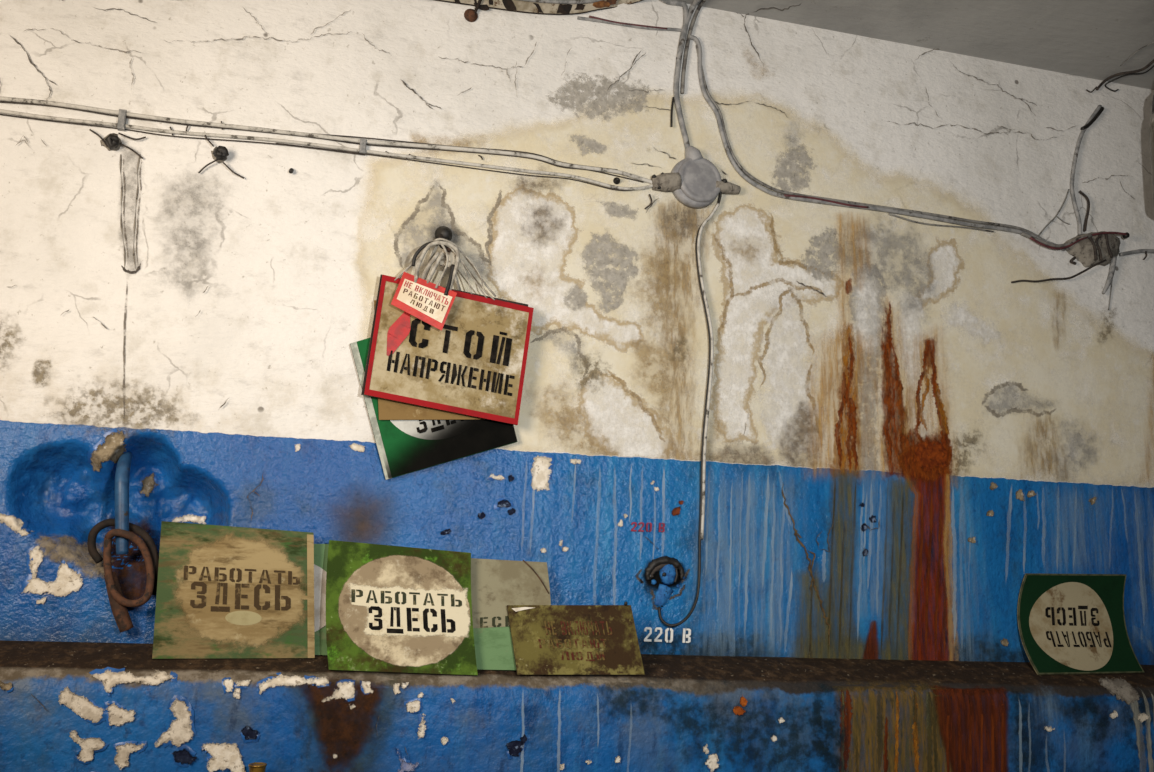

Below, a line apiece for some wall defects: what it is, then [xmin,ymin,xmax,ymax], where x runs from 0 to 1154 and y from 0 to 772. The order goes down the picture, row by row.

crack [11,8,179,97]
crack [207,10,385,52]
crack [403,44,536,109]
crack [889,49,1075,140]
leakage [360,97,1154,484]
rust [839,222,861,311]
rust [797,304,957,661]
peeling [0,514,104,604]
peeling [58,667,260,772]
peeling [222,672,373,709]
peeling [393,682,426,739]
rust [836,686,1008,772]